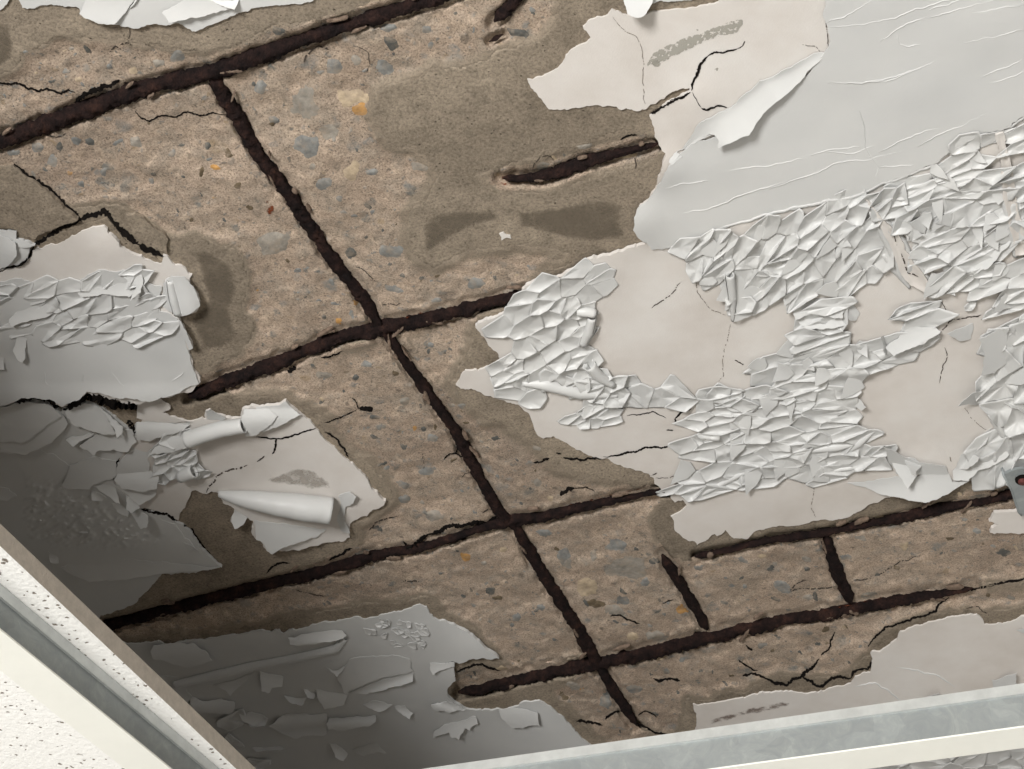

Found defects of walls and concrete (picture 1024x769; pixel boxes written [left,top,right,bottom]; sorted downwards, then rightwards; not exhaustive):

crack [614,19,745,114]
crack [1,164,164,269]
leakage [196,256,233,345]
spalling [0,0,572,618]
leakage [428,214,494,247]
leakage [522,204,620,239]
peeling [456,0,1024,545]
crack [15,393,137,434]
crack [206,398,373,492]
crack [533,407,698,479]
peeling [100,285,1024,769]
crack [739,578,1024,688]